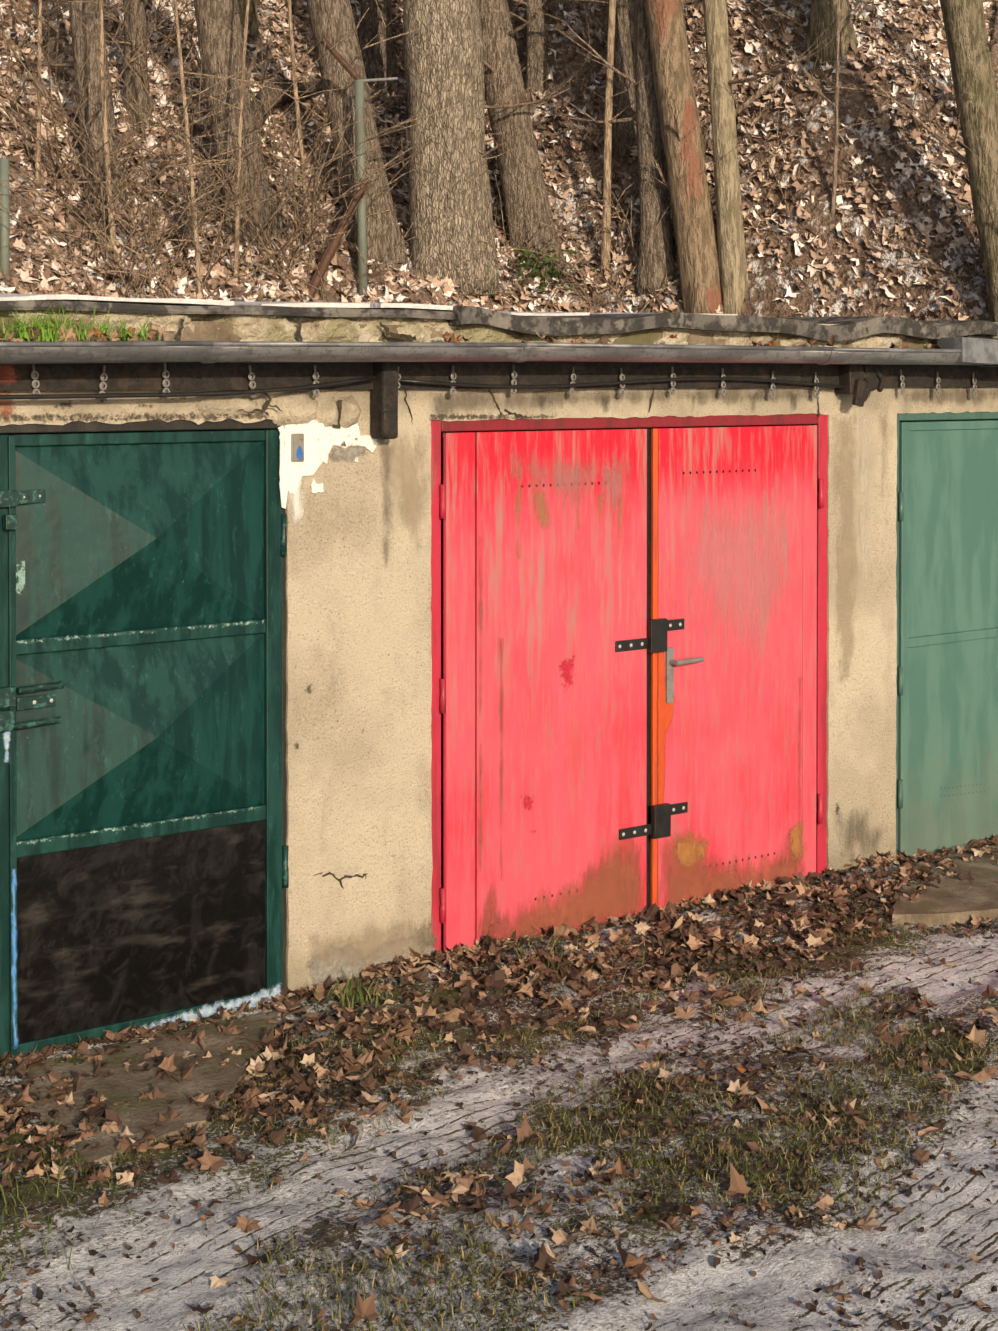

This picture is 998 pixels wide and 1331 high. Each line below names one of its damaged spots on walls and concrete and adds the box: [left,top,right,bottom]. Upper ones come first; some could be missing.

rust [0,364,13,414]
spalling [0,397,266,423]
flaking render [278,420,378,521]
rust [483,850,638,940]
rust [666,824,803,906]